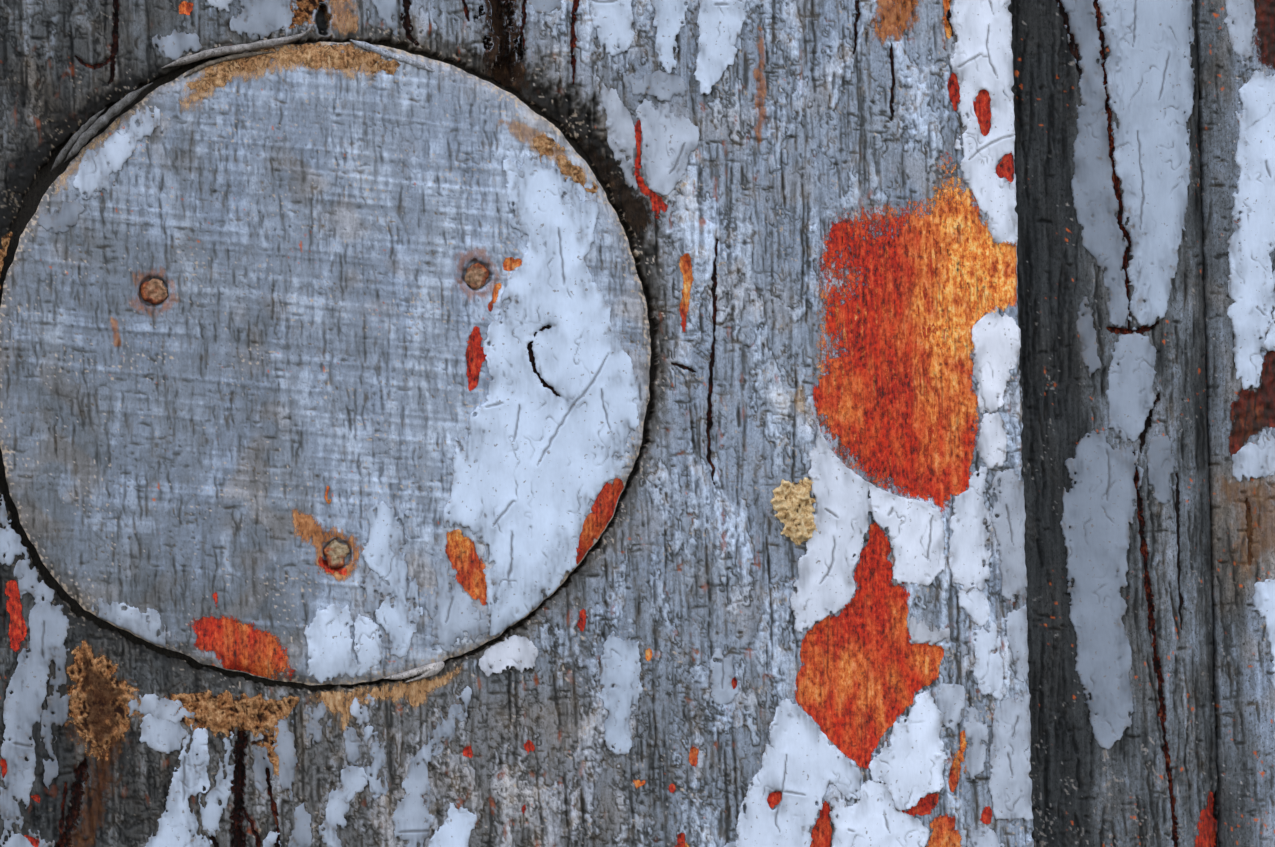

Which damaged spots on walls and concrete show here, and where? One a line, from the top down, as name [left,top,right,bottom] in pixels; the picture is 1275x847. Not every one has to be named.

peeling [588,0,635,56]
peeling [597,0,747,219]
peeling [1224,0,1275,482]
peeling [188,155,639,684]
peeling [724,0,1034,847]
peeling [1057,0,1195,750]
peeling [0,494,71,847]
peeling [91,598,177,647]
peeling [128,694,235,847]
corrosion [292,509,364,581]
peeling [252,686,477,847]
peeling [595,631,652,755]